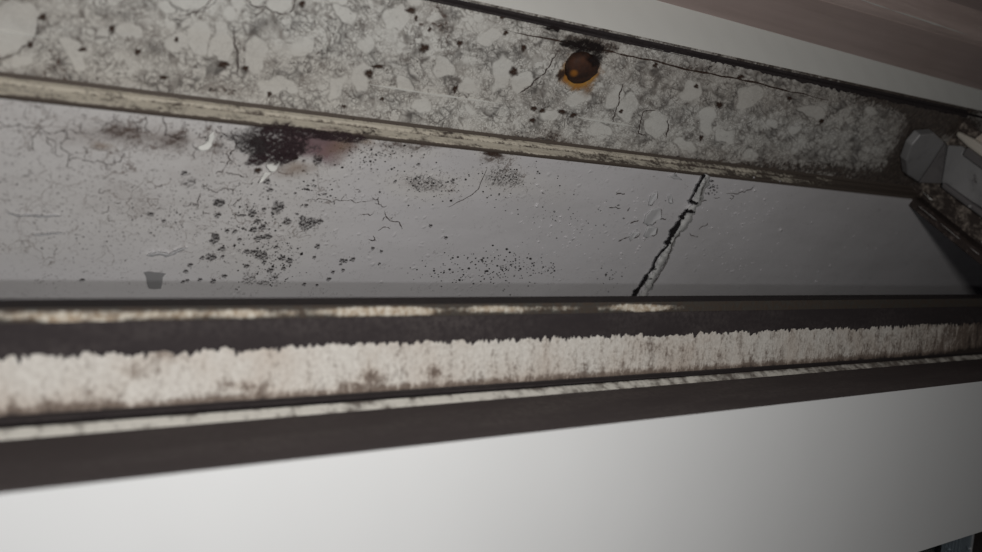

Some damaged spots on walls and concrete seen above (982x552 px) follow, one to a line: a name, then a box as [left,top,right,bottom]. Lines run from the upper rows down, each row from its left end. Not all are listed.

corrosion [556,67,598,90]
damp [167,117,524,290]
damp [410,236,562,295]
crack [633,174,753,296]
damp [0,322,982,416]